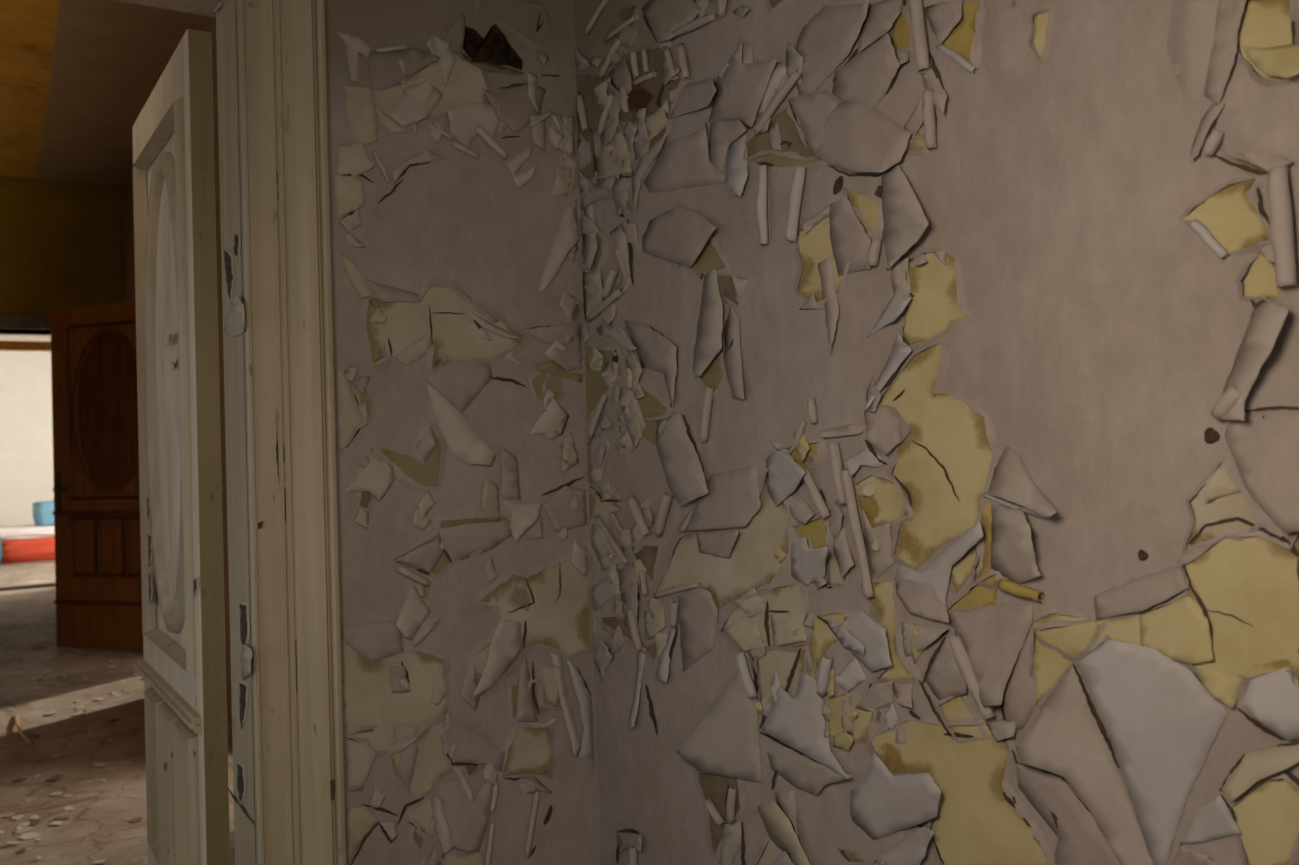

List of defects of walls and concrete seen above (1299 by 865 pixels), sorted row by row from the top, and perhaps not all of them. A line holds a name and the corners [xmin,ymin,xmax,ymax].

peeling [0,0,60,178]
peeling [334,0,1299,865]